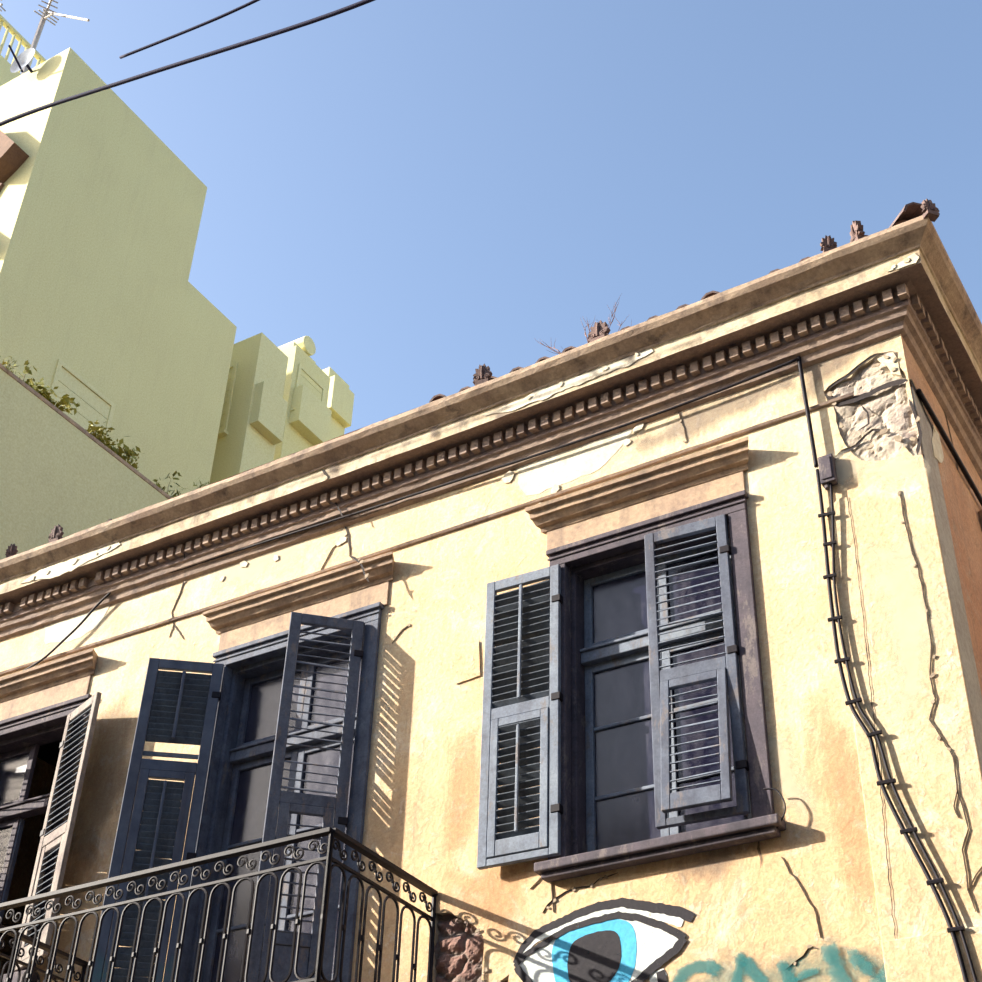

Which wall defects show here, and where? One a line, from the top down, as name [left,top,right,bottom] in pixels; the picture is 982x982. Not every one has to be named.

peeling [502,423,644,504]
flaking render [825,351,922,481]
crack [321,502,369,583]
crack [846,491,896,936]
crack [897,490,982,912]
flaking render [434,914,488,982]
crack [530,872,618,913]
crack [781,857,821,968]